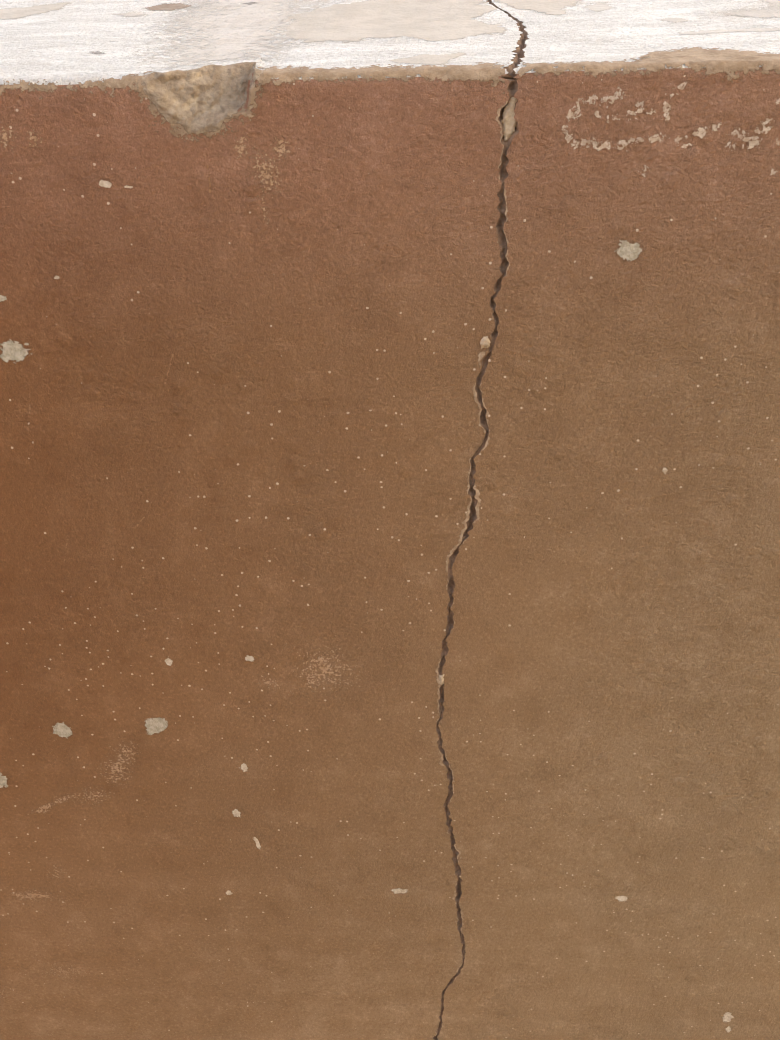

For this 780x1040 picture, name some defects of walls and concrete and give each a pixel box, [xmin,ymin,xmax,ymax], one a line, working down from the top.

peeling [112,0,616,142]
peeling [562,82,780,152]
peeling [0,339,32,364]
crack [432,0,529,1040]